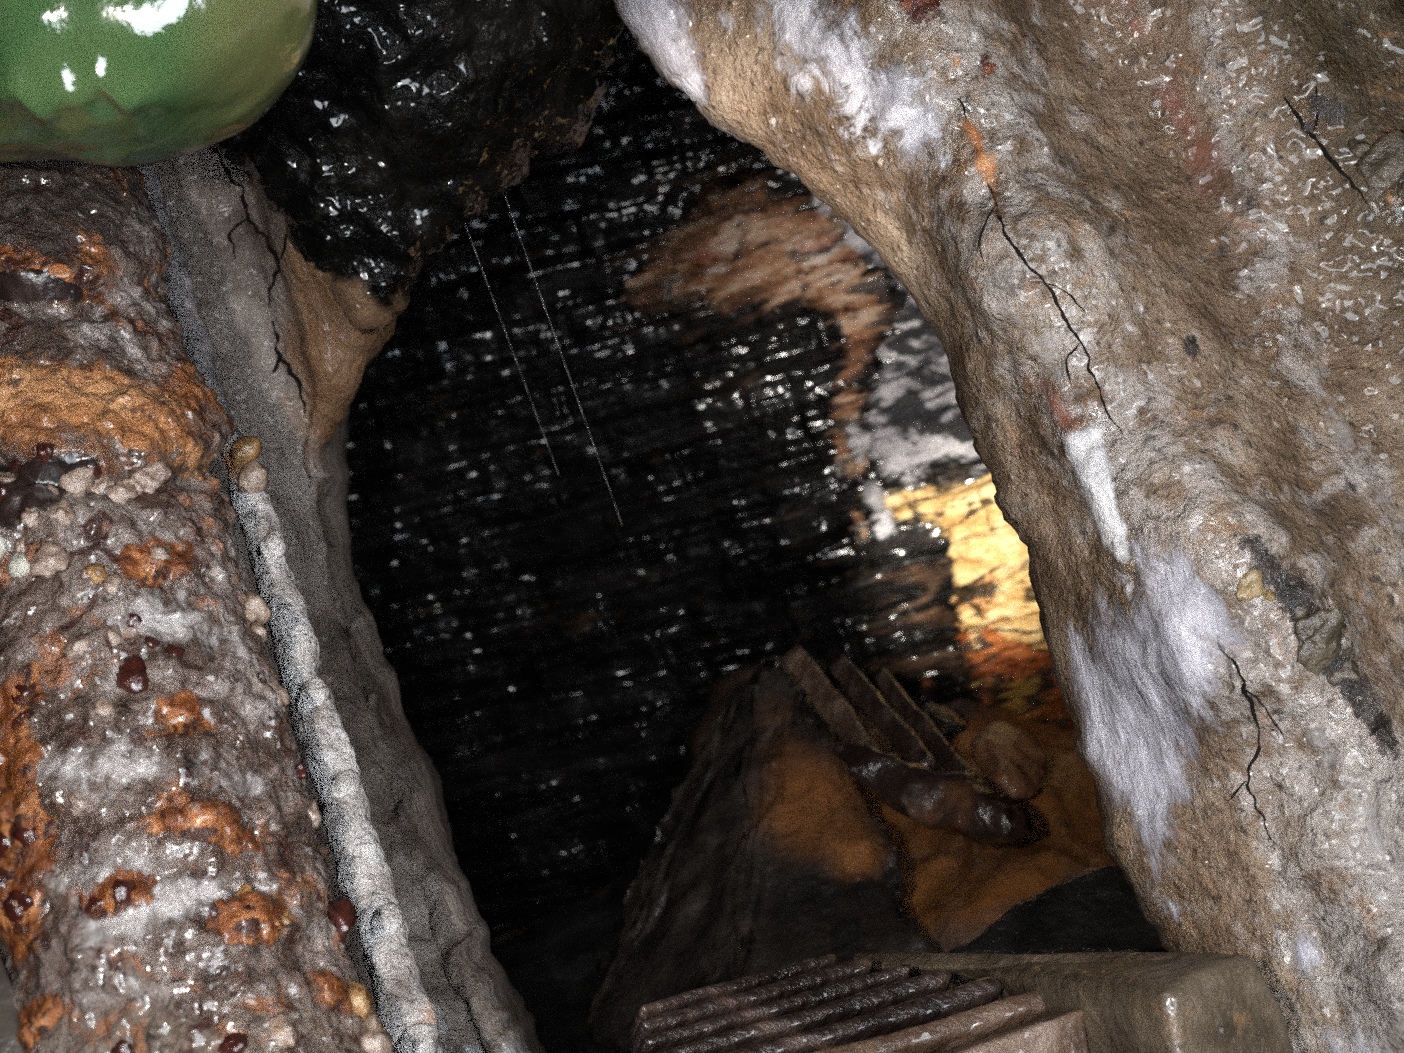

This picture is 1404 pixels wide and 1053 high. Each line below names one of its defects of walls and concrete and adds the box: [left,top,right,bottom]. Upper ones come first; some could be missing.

efflorescence [614,0,706,113]
efflorescence [758,0,950,168]
crack [1284,84,1368,205]
corrosion [0,353,221,500]
crack [212,147,306,416]
corrosion [621,168,898,478]
efflorescence [812,193,985,539]
crack [978,183,1125,439]
corrosion [0,659,60,980]
corrosion [78,867,160,920]
efflorescence [1064,423,1243,875]
crack [1217,635,1286,840]